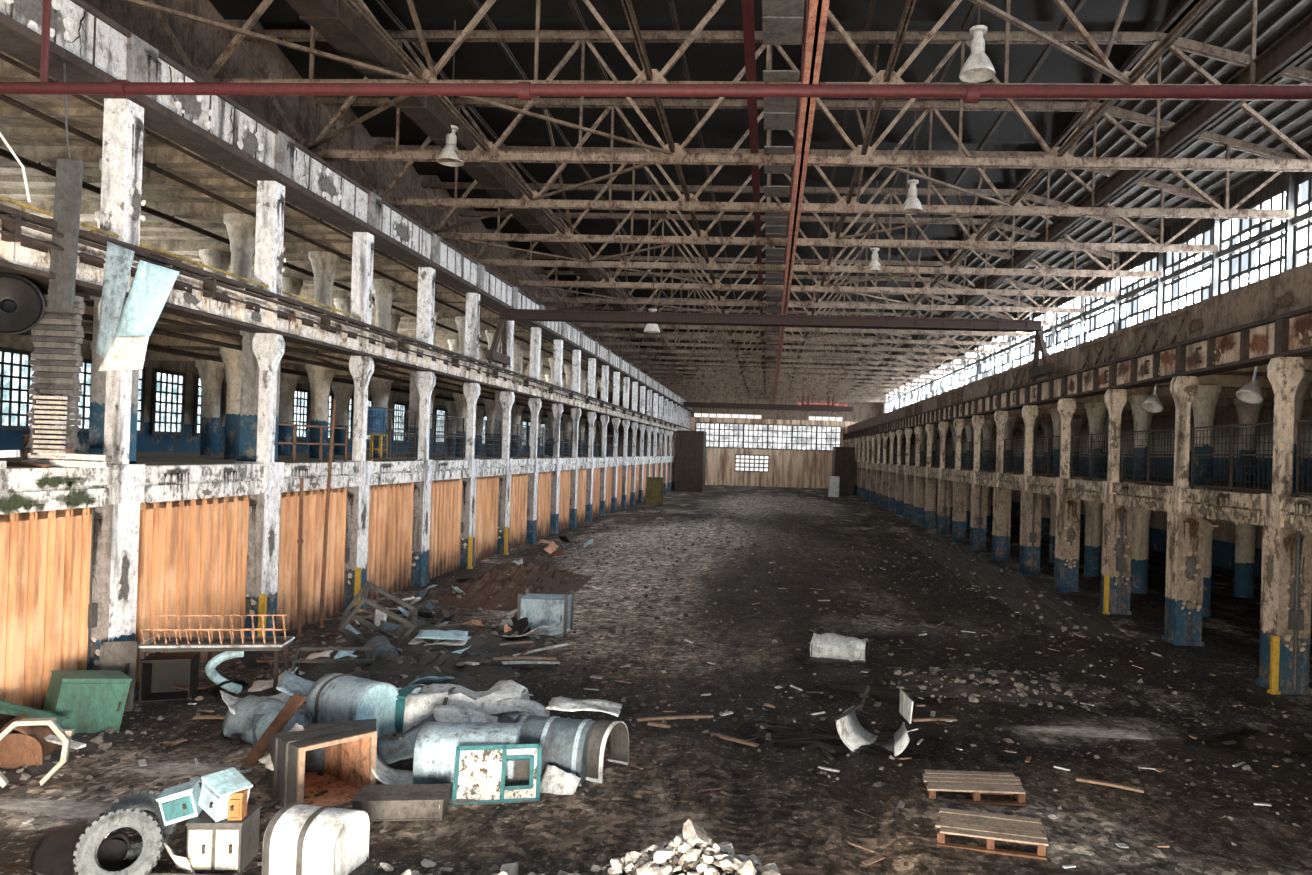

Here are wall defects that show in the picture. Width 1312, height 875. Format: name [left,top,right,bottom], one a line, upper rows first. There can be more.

peeling [3,0,74,40]
peeling [175,78,213,129]
peeling [237,124,263,162]
peeling [127,181,146,227]
peeling [314,168,342,203]
peeling [393,219,415,245]
peeling [275,248,286,280]
peeling [178,287,203,308]
corrosion [1294,315,1312,337]
leakage [3,481,103,571]
peeling [116,552,134,611]
peeling [1264,546,1308,611]